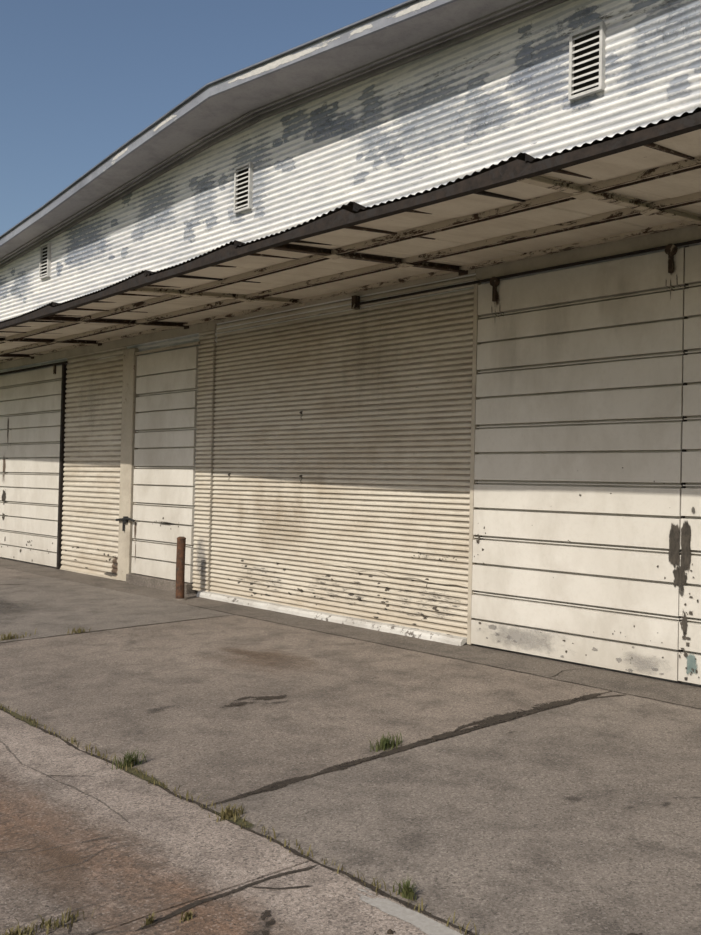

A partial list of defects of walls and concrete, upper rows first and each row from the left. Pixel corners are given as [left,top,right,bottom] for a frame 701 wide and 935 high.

peeling [56,0,701,276]
crack [0,604,701,935]
peeling [679,593,700,680]